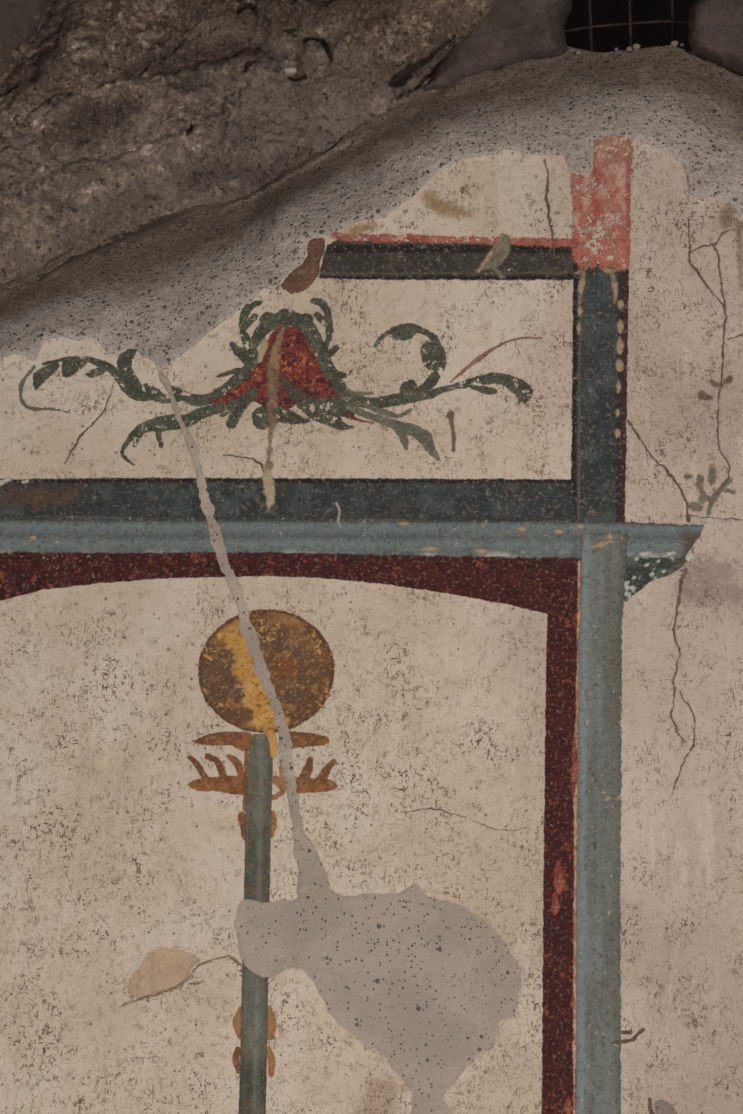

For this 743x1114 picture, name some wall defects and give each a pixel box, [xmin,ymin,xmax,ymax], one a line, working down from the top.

spalling [476,234,511,279]
peeling [574,230,624,393]
crack [688,219,743,487]
peeling [698,376,733,400]
crack [627,420,740,523]
crack [155,363,330,901]
crack [670,568,696,793]
flaking render [128,947,200,997]